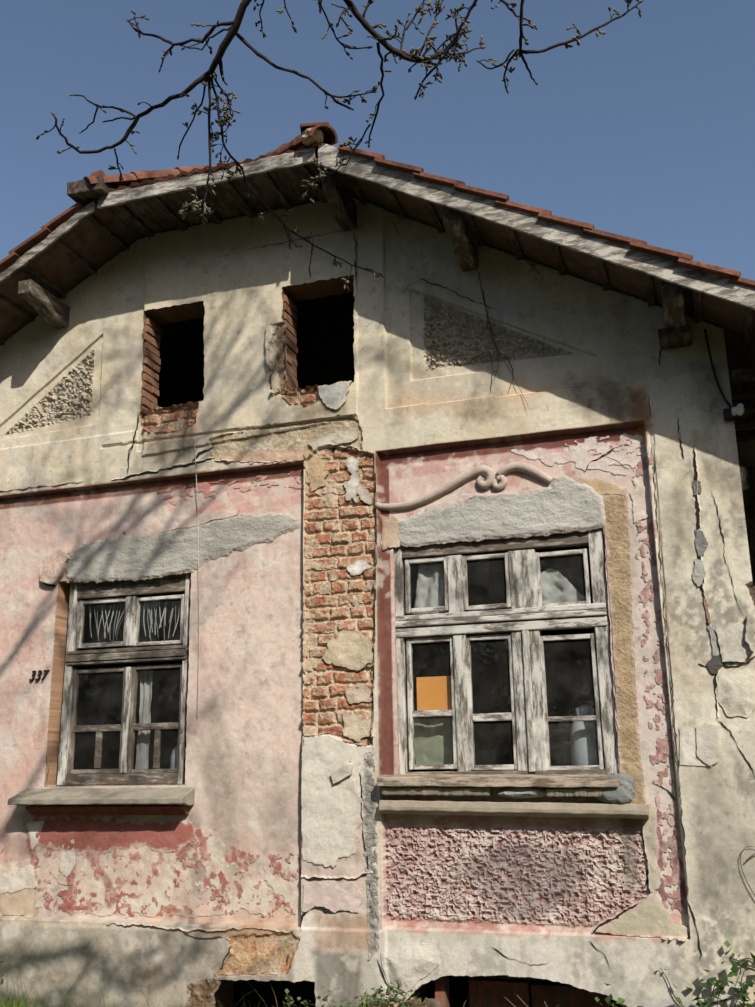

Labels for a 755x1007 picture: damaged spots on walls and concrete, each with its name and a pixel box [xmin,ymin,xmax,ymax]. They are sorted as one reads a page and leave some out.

crack [403,279,495,309]
crack [0,481,85,492]
crack [112,413,215,480]
crack [584,444,627,471]
crack [677,419,755,777]
flaking render [0,322,400,960]
flaking render [511,433,691,941]
crack [651,443,702,958]
flaking render [187,932,300,1007]